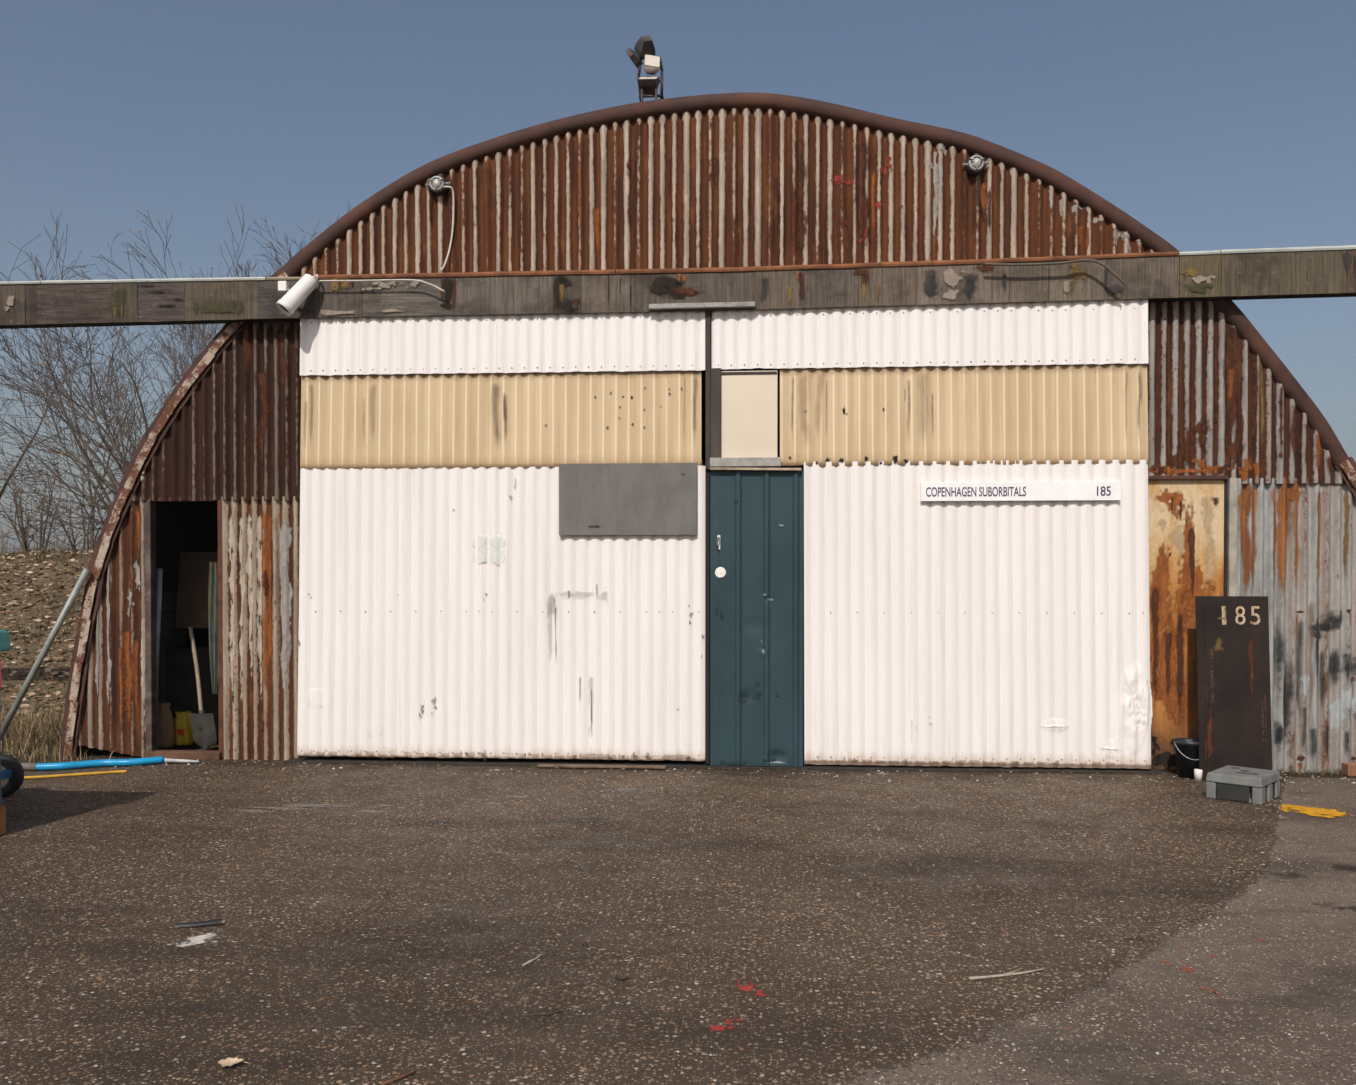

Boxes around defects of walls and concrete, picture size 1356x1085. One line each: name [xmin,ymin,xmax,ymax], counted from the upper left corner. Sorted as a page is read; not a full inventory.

corrosion [428,174,452,235]
corrosion [579,163,599,251]
corrosion [627,160,636,226]
corrosion [791,140,807,251]
corrosion [856,144,876,242]
corrosion [1063,263,1087,293]
corrosion [1148,323,1265,724]
corrosion [1273,478,1300,588]
corrosion [261,511,273,693]
peeling [227,514,312,711]
corrosion [119,632,138,723]